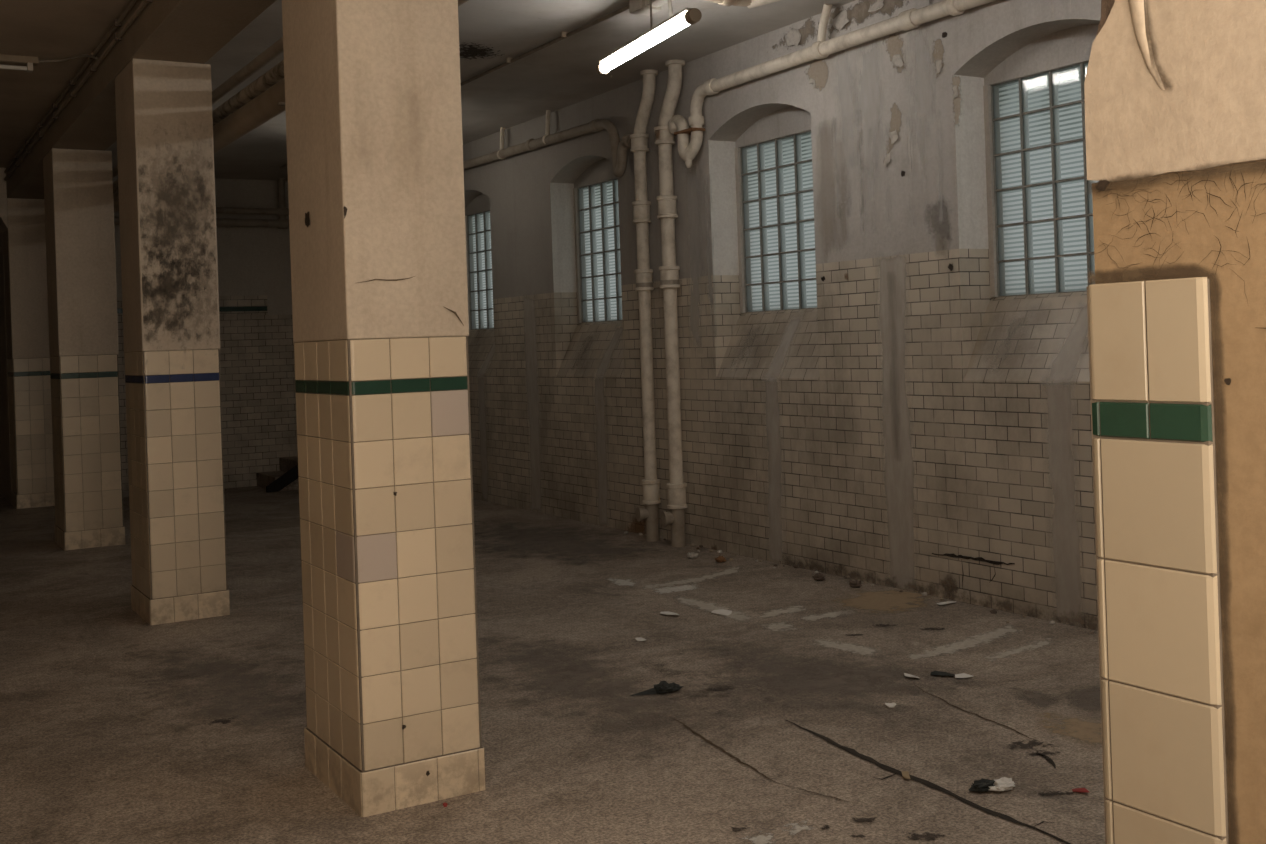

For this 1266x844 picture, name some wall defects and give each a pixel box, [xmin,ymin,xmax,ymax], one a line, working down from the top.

flaking render [772,0,909,49]
water stain [140,159,216,340]
crack [1090,171,1266,302]
crack [932,553,1015,587]
crack [670,717,854,803]
crack [786,720,1071,844]